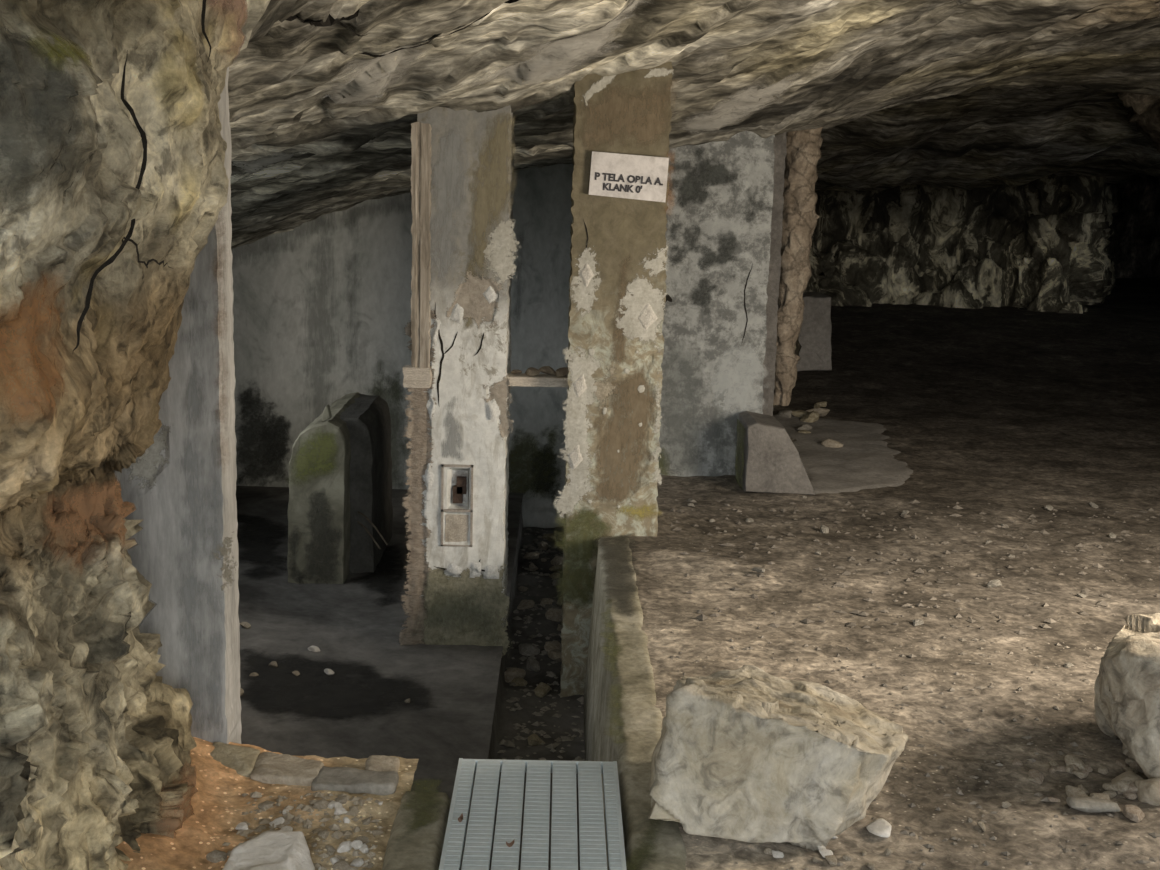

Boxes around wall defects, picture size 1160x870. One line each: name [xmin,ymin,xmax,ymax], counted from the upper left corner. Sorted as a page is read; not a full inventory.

spalling [581,75,616,106]
spalling [644,67,674,78]
water stain [669,150,735,207]
peeling [570,242,602,317]
peeling [616,245,672,353]
water stain [671,224,736,308]
flaking render [399,219,520,658]
peeling [554,346,630,519]
peeling [638,369,663,485]